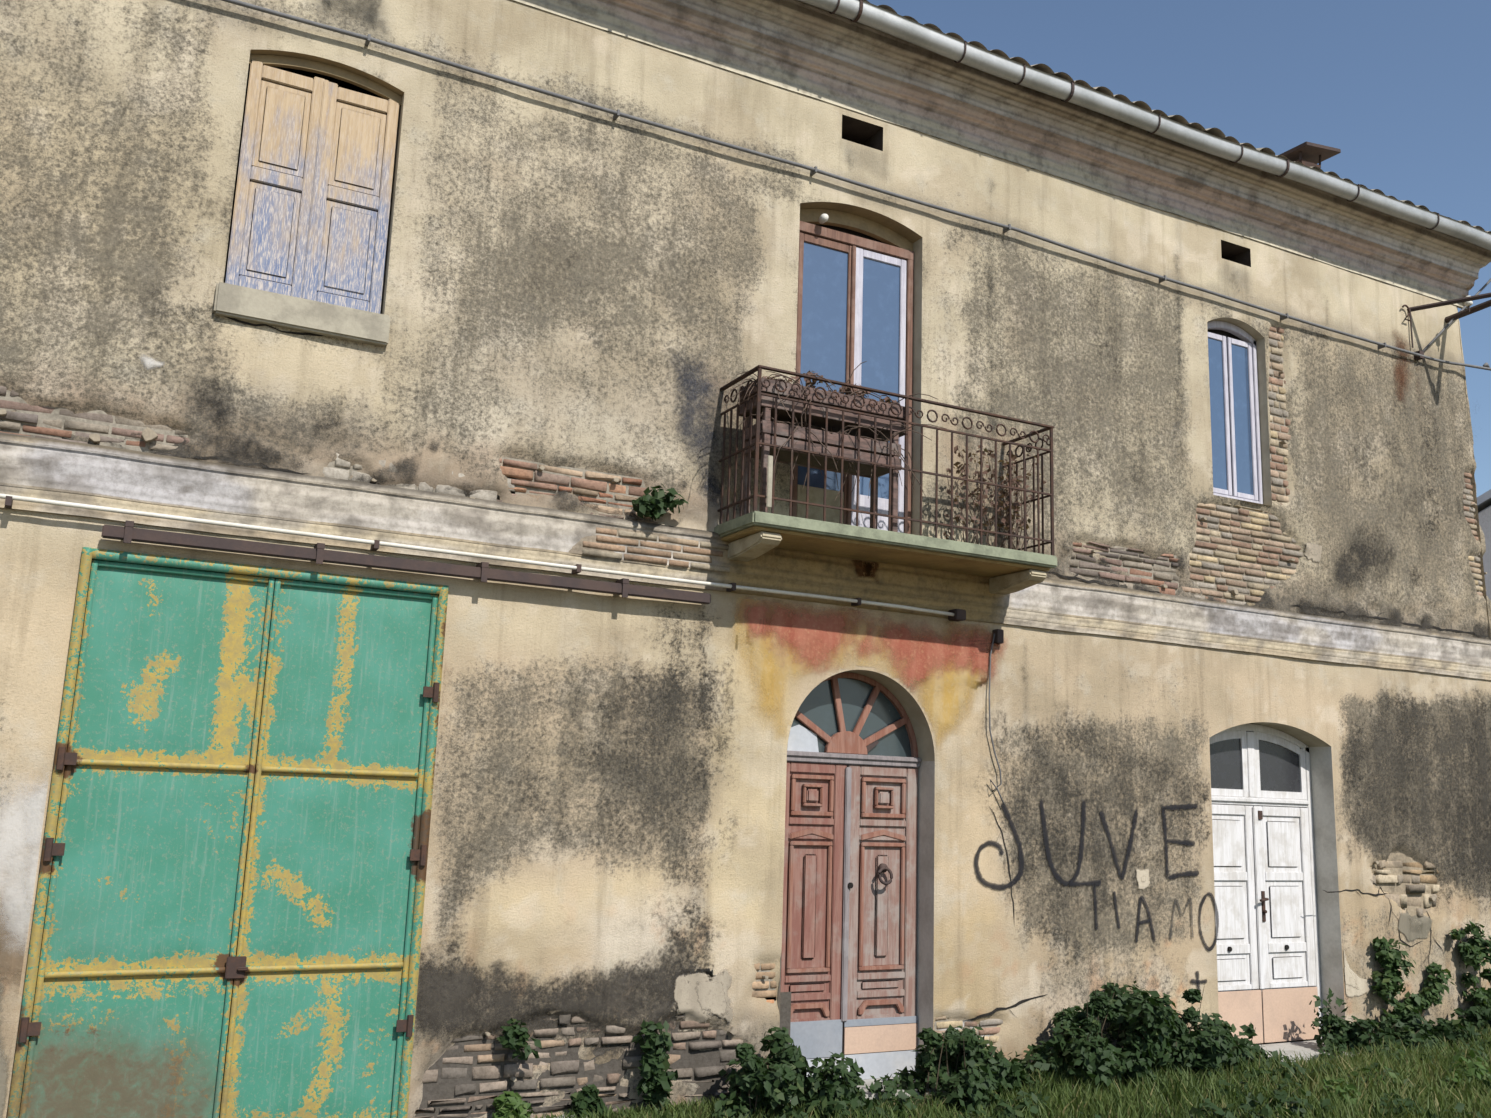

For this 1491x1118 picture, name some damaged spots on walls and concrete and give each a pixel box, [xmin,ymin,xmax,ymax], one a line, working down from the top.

flaking render [0,386,190,457]
water stain [149,382,304,470]
flaking render [323,453,730,572]
flaking render [1057,327,1322,606]
peeling [738,599,1000,728]
water stain [416,905,709,1058]
water stain [580,612,733,886]
water stain [992,715,1210,964]
crack [1323,879,1445,965]
flaking render [1370,851,1440,942]
water stain [1341,694,1491,910]
flaking render [413,1014,750,1118]